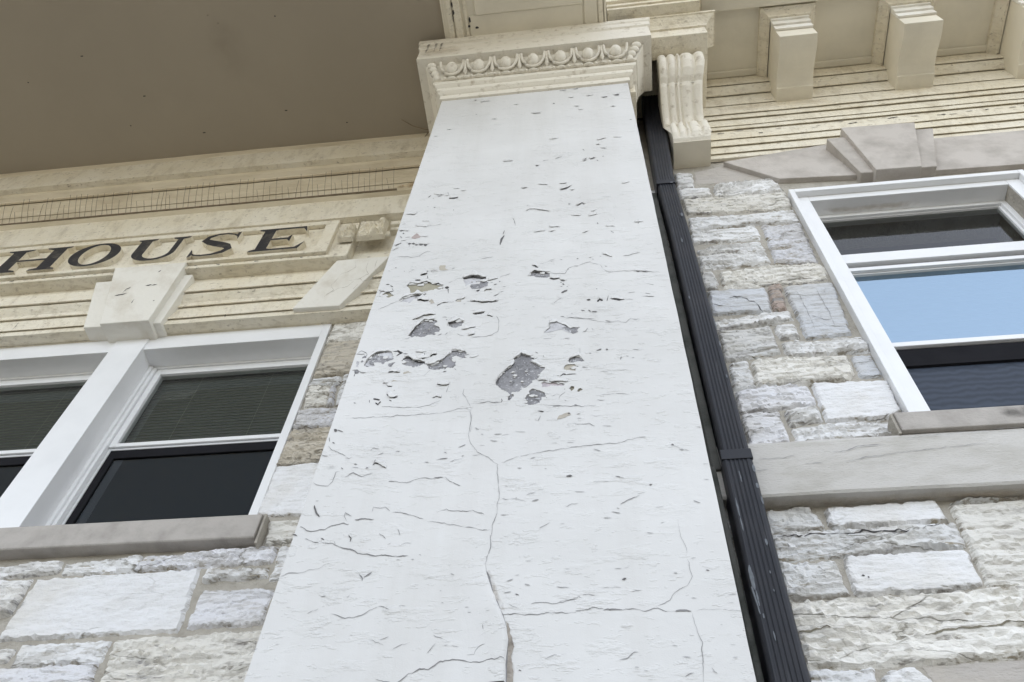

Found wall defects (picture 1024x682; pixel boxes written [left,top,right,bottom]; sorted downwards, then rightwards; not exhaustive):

flaking render [354,265,508,408]
flaking render [495,349,583,420]
flaking render [544,292,631,339]
crack [283,390,738,682]